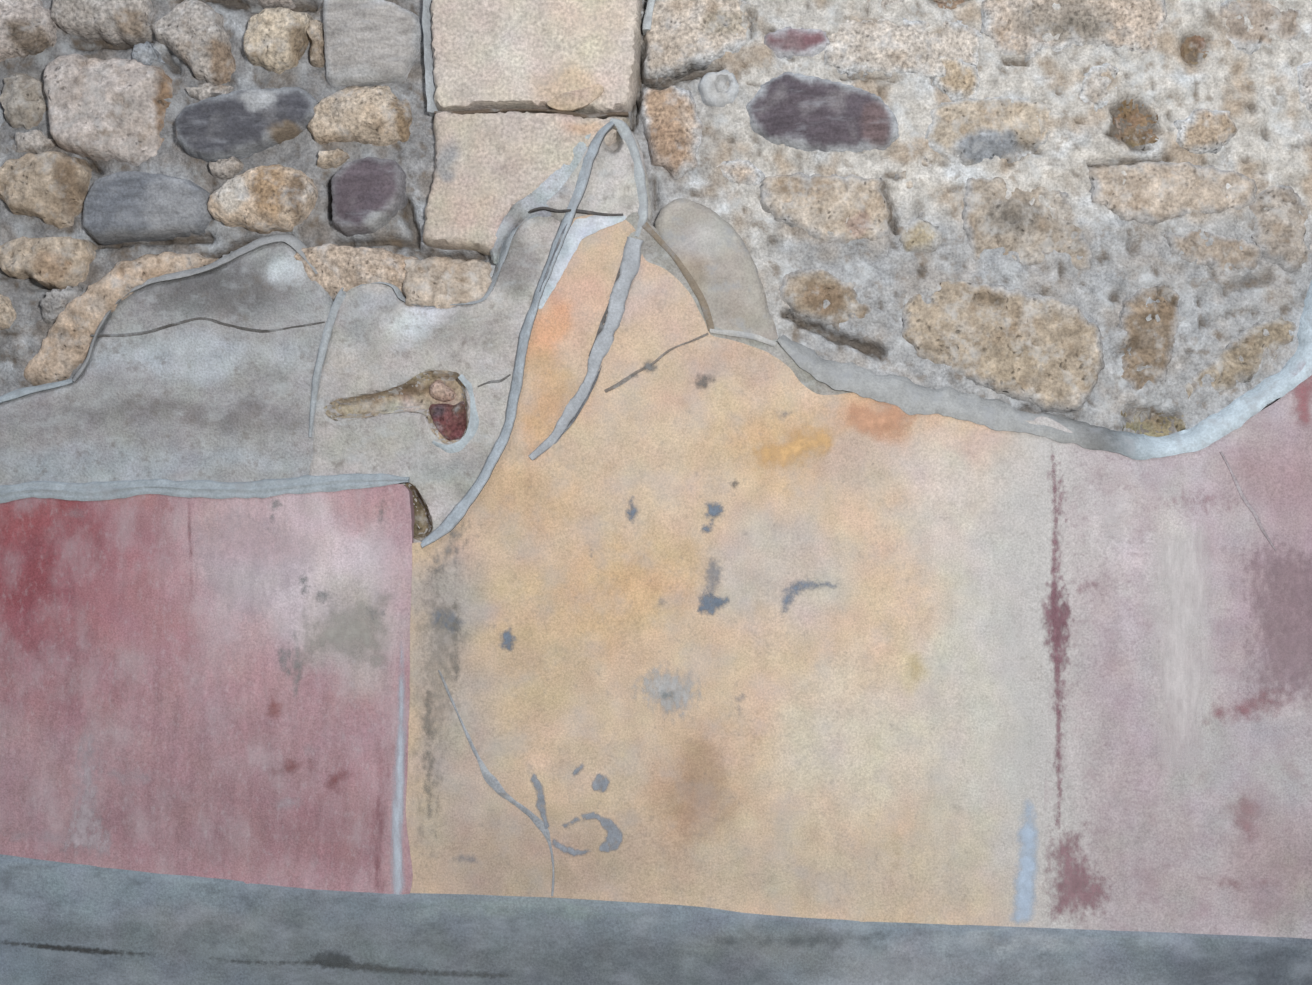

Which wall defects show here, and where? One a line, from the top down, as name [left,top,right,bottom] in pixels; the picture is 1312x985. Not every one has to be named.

crack [90,317,325,337]
flaking render [0,126,852,543]
crack [528,207,709,461]
crack [438,670,622,896]